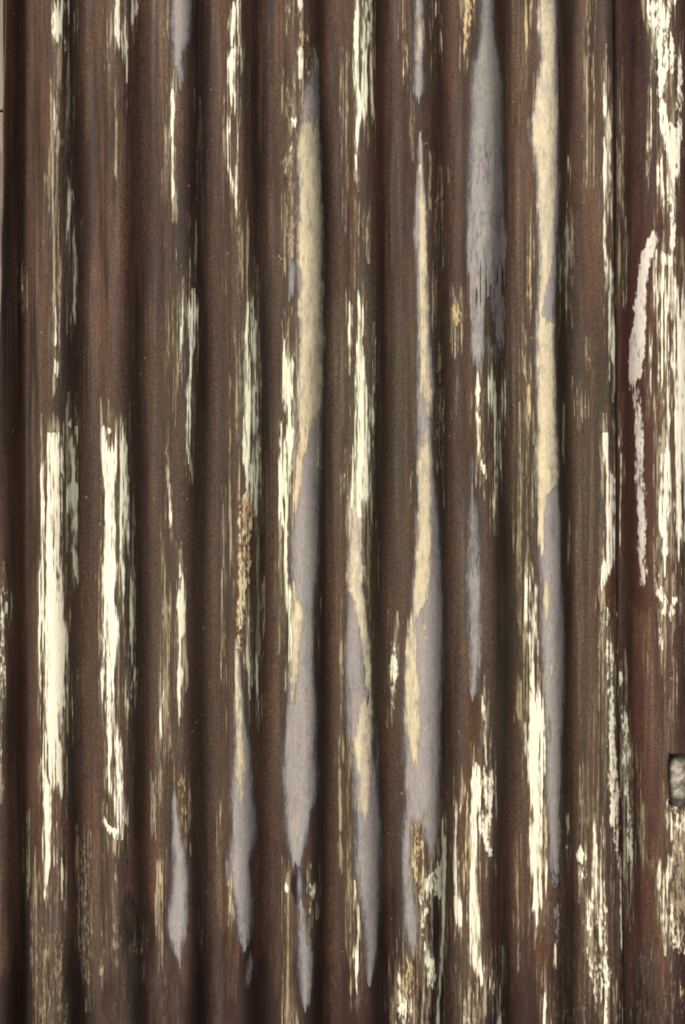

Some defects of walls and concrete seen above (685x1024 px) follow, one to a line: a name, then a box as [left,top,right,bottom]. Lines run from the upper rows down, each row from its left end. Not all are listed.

peeling [23,0,203,1024]
peeling [216,0,325,1024]
corrosion [416,989,437,1024]
corrosion [428,891,440,953]
corrosion [481,675,496,773]
peeling [335,0,685,1024]
corrosion [600,570,614,612]
corrosion [620,211,660,611]